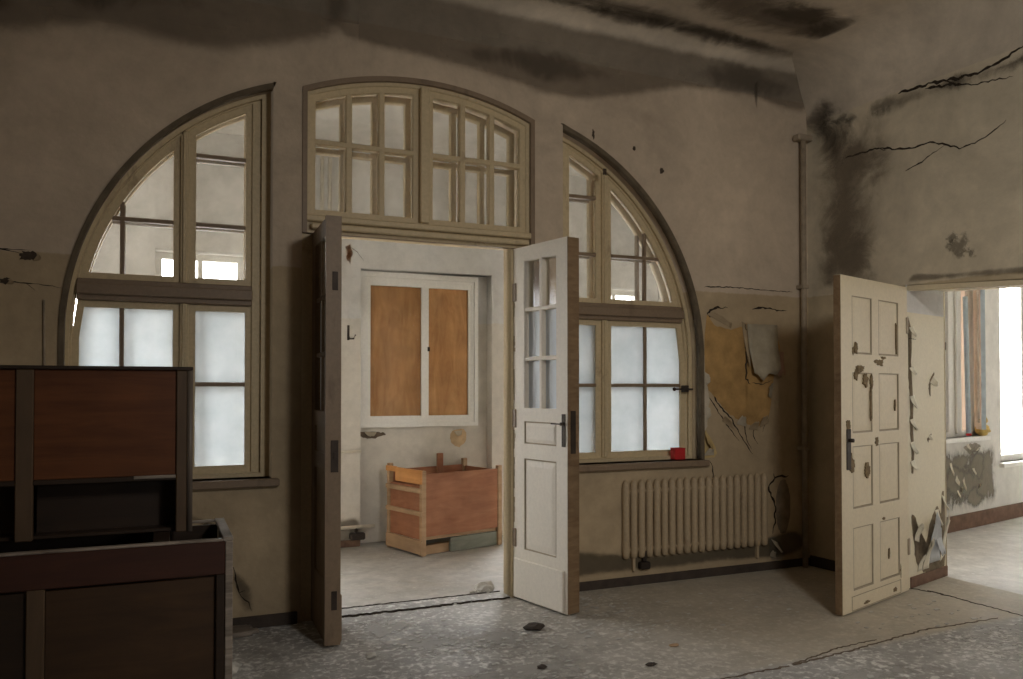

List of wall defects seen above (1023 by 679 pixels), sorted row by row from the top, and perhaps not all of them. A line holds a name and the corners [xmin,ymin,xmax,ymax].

leakage [708,0,834,36]
crack [898,46,1023,94]
crack [866,120,1006,171]
flaking render [19,251,42,261]
peeling [852,318,919,474]
peeling [964,443,981,456]
peeling [911,463,981,572]
crack [721,588,1022,679]